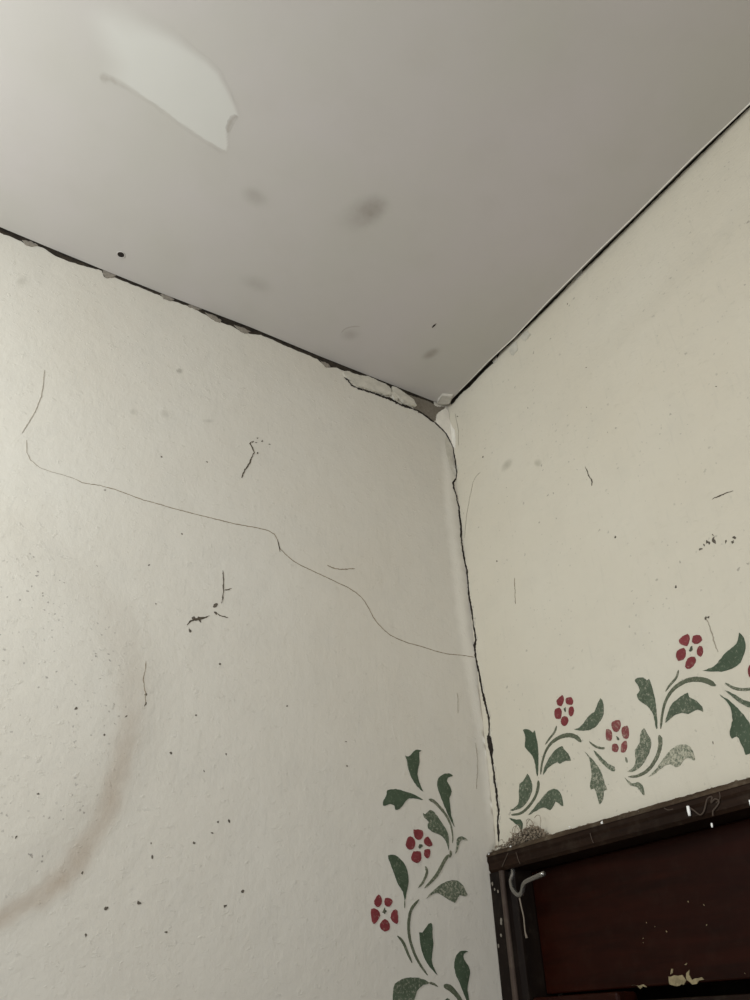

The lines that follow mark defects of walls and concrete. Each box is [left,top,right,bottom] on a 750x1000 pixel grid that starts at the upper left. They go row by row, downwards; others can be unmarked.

peeling [75,0,241,154]
water stain [0,559,154,936]
crack [0,105,750,842]
peeling [342,371,495,845]